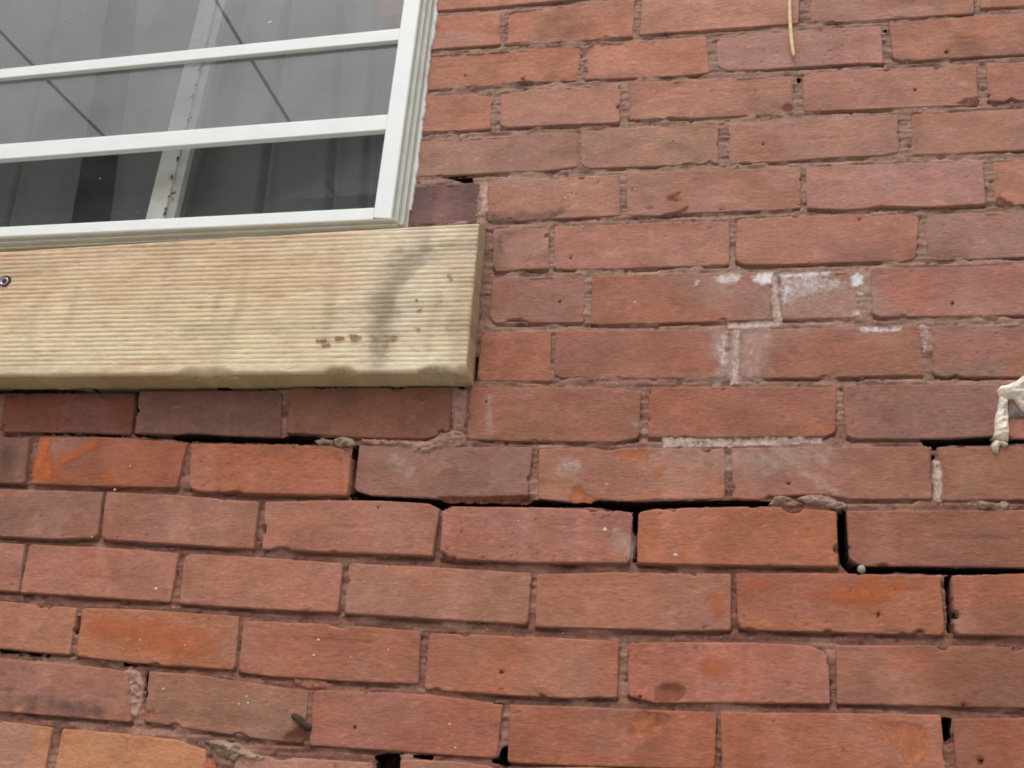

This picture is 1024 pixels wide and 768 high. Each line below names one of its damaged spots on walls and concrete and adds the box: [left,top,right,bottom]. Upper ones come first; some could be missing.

leakage [720,272,839,385]
crack [217,385,275,393]
crack [315,384,413,392]
crack [0,389,771,563]
crack [921,437,1024,461]
crack [829,509,1024,633]